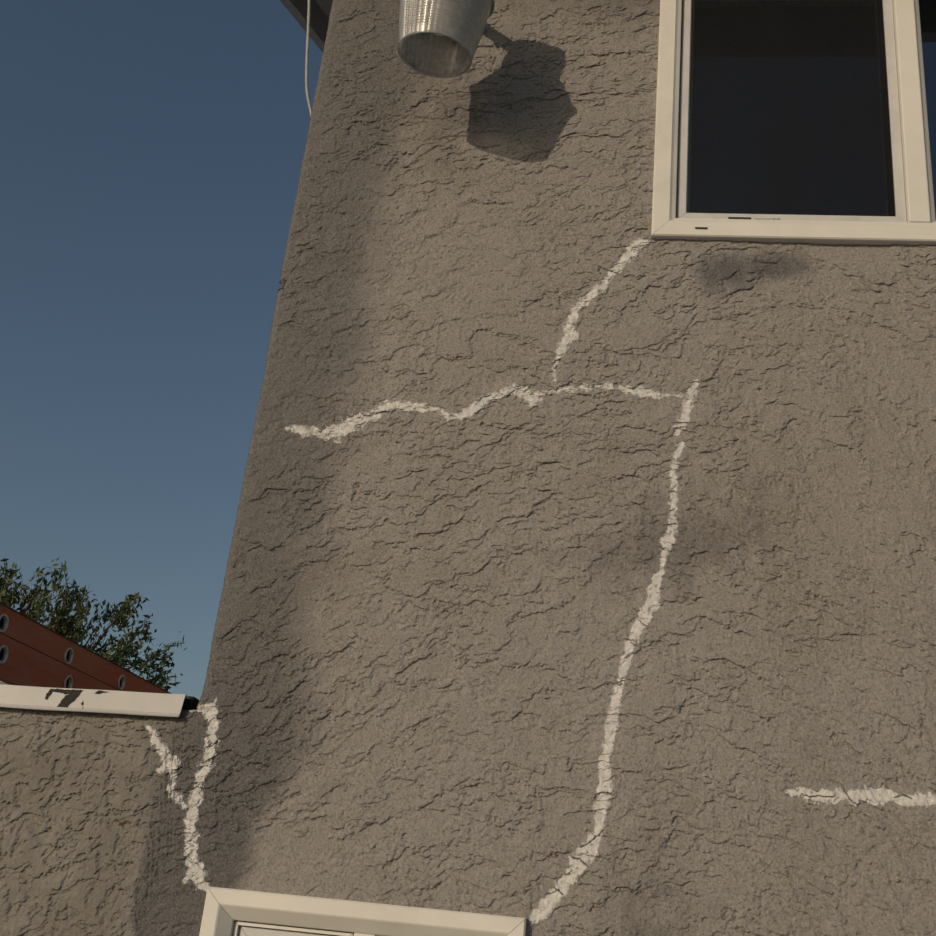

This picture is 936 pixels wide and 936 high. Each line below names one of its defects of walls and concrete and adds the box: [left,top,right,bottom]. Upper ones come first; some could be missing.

crack [284,238,699,924]
crack [145,699,220,892]
crack [784,785,936,808]